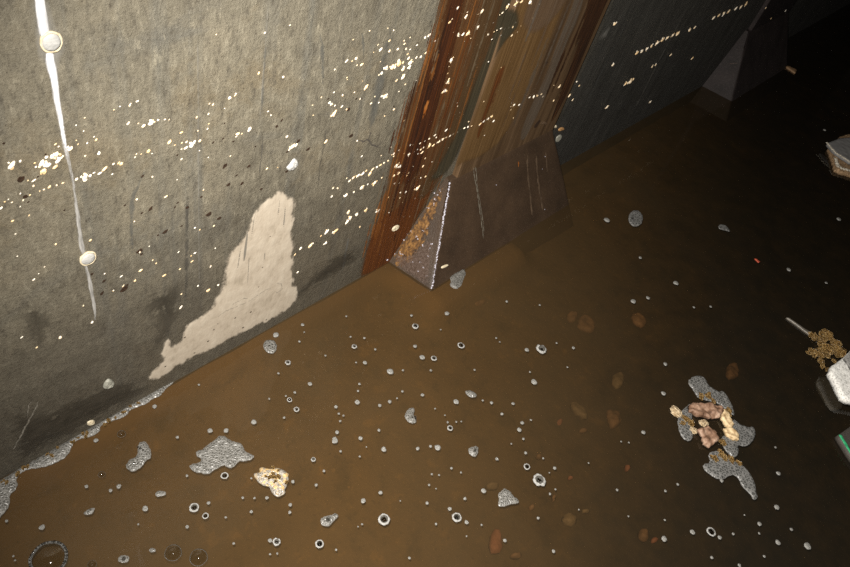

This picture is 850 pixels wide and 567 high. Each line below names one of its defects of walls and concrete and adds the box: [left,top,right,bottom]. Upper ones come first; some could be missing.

corrosion [361,0,503,282]
corrosion [458,0,566,164]
corrosion [545,0,607,121]
peeling [149,191,298,379]
damp [23,388,135,452]